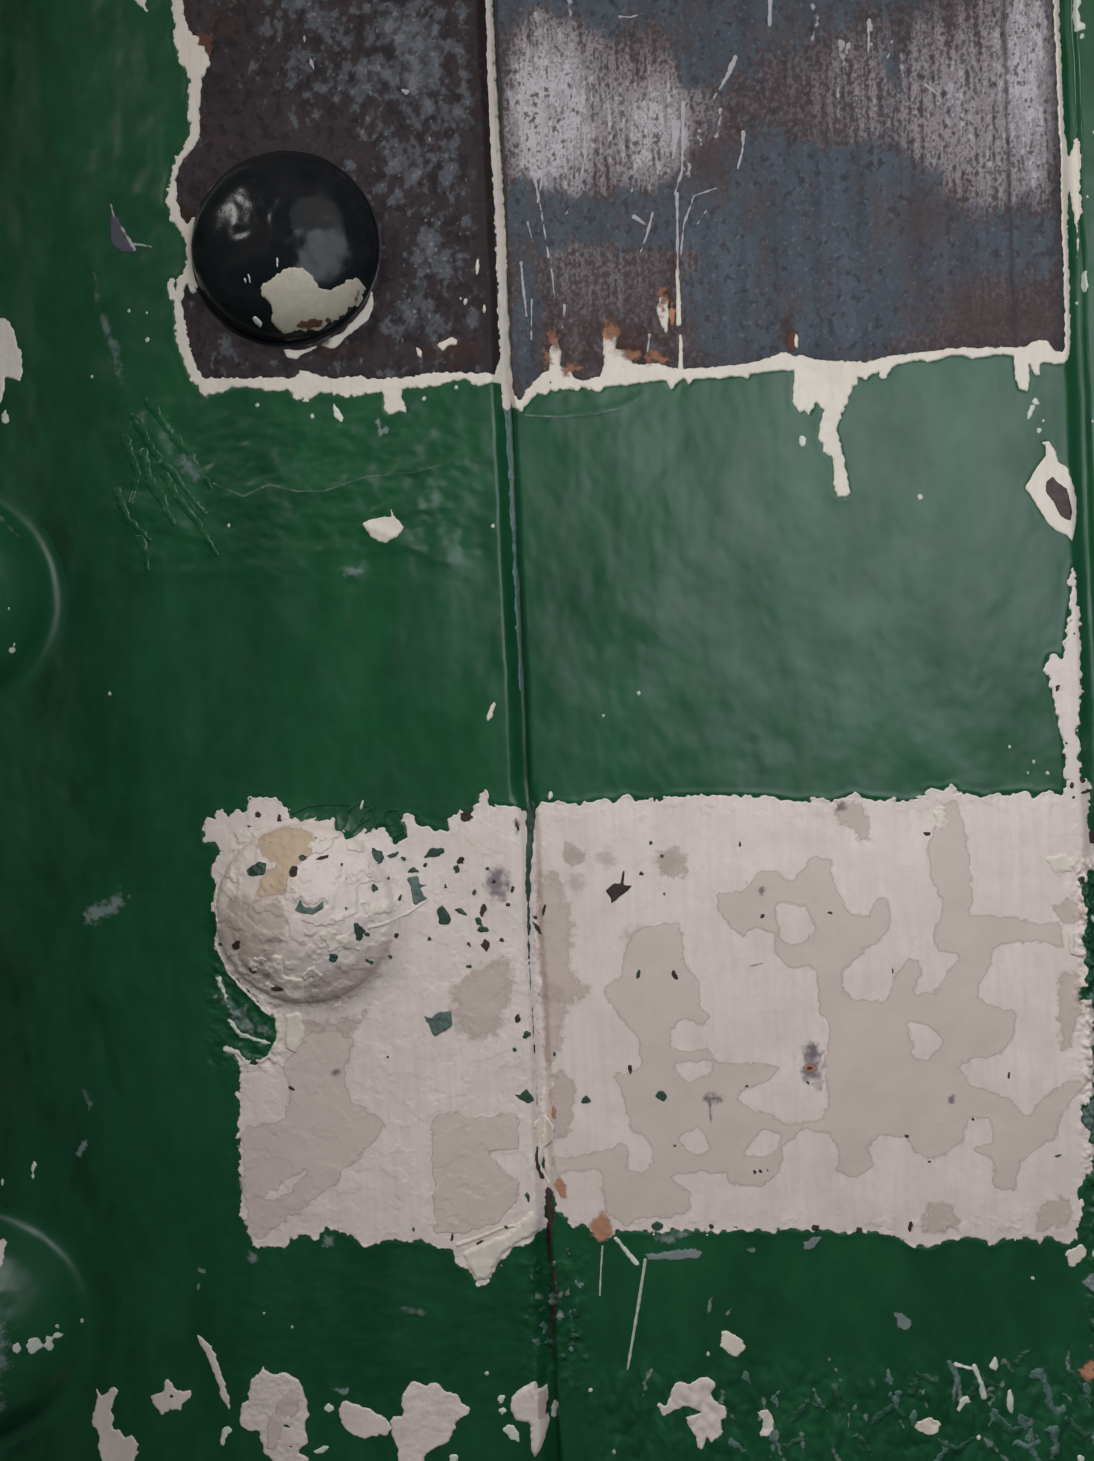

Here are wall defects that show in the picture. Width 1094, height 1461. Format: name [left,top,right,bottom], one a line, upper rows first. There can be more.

peeling [0,318,23,424]
corrosion [297,317,332,330]
peeling [165,0,1094,691]
peeling [202,567,1094,1362]
peeling [92,1387,139,1461]
peeling [151,1379,191,1415]
peeling [197,1335,470,1461]
peeling [498,1381,558,1457]
peeling [657,1377,746,1452]
peeling [706,1331,1094,1461]